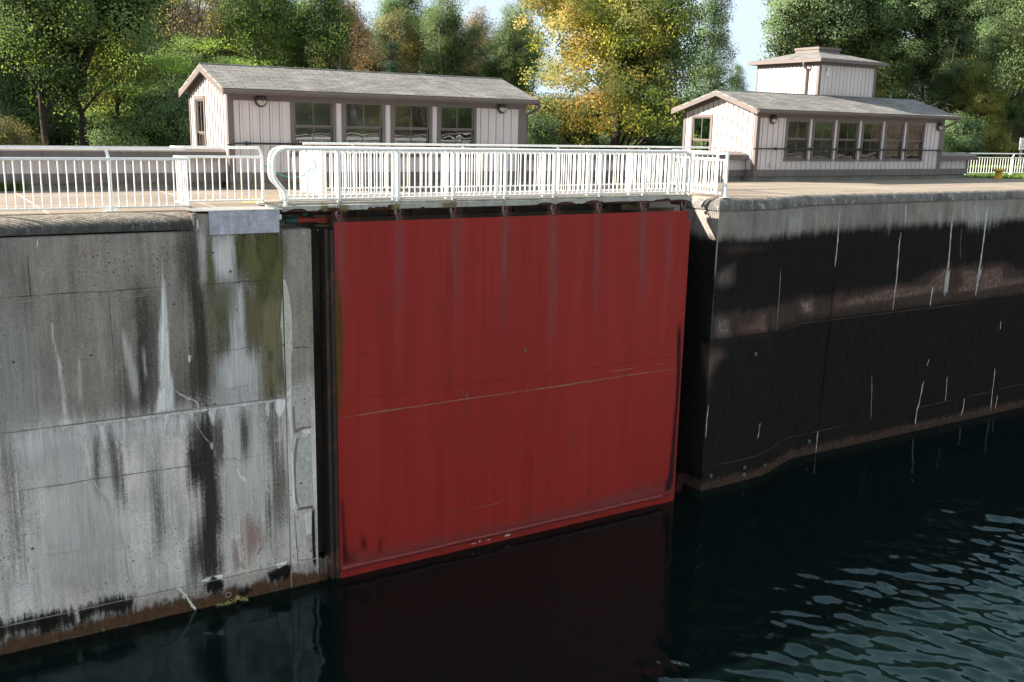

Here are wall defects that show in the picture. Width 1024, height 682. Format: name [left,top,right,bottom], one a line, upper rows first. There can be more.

leakage [0,215,317,645]
leakage [665,201,1024,492]
rust [675,397,1024,491]
rust [0,568,328,655]